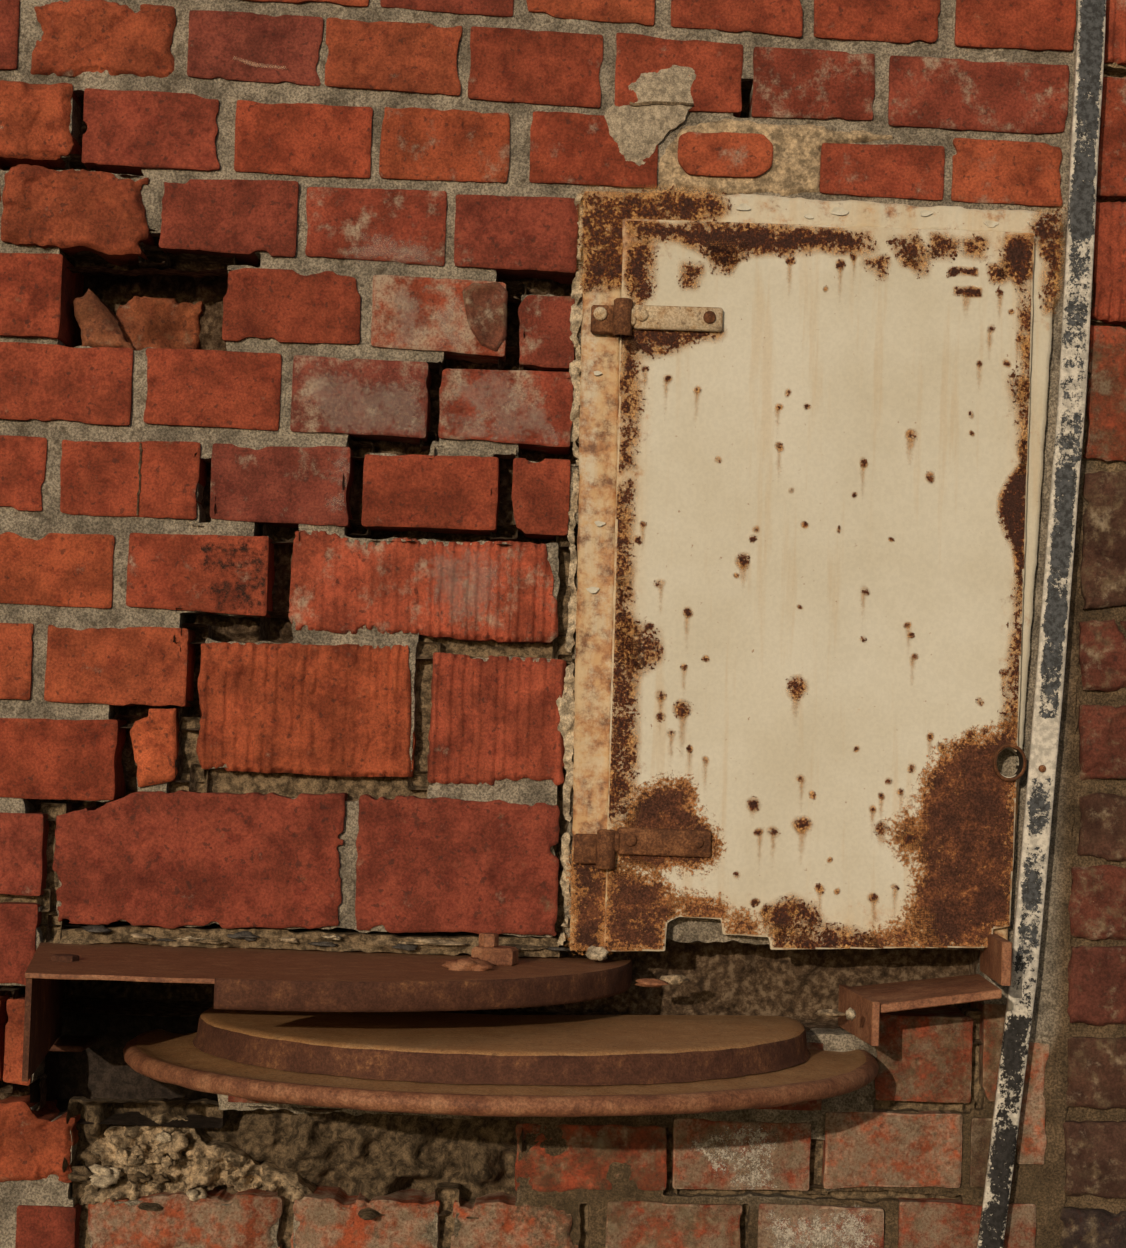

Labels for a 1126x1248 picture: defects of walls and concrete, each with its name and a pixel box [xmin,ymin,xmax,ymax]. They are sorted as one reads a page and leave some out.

spalling [64,251,237,351]
crack [0,264,582,945]
corrosion [565,183,1066,955]
crack [0,985,26,1004]
crack [0,1070,47,1111]
spalling [68,1113,317,1205]